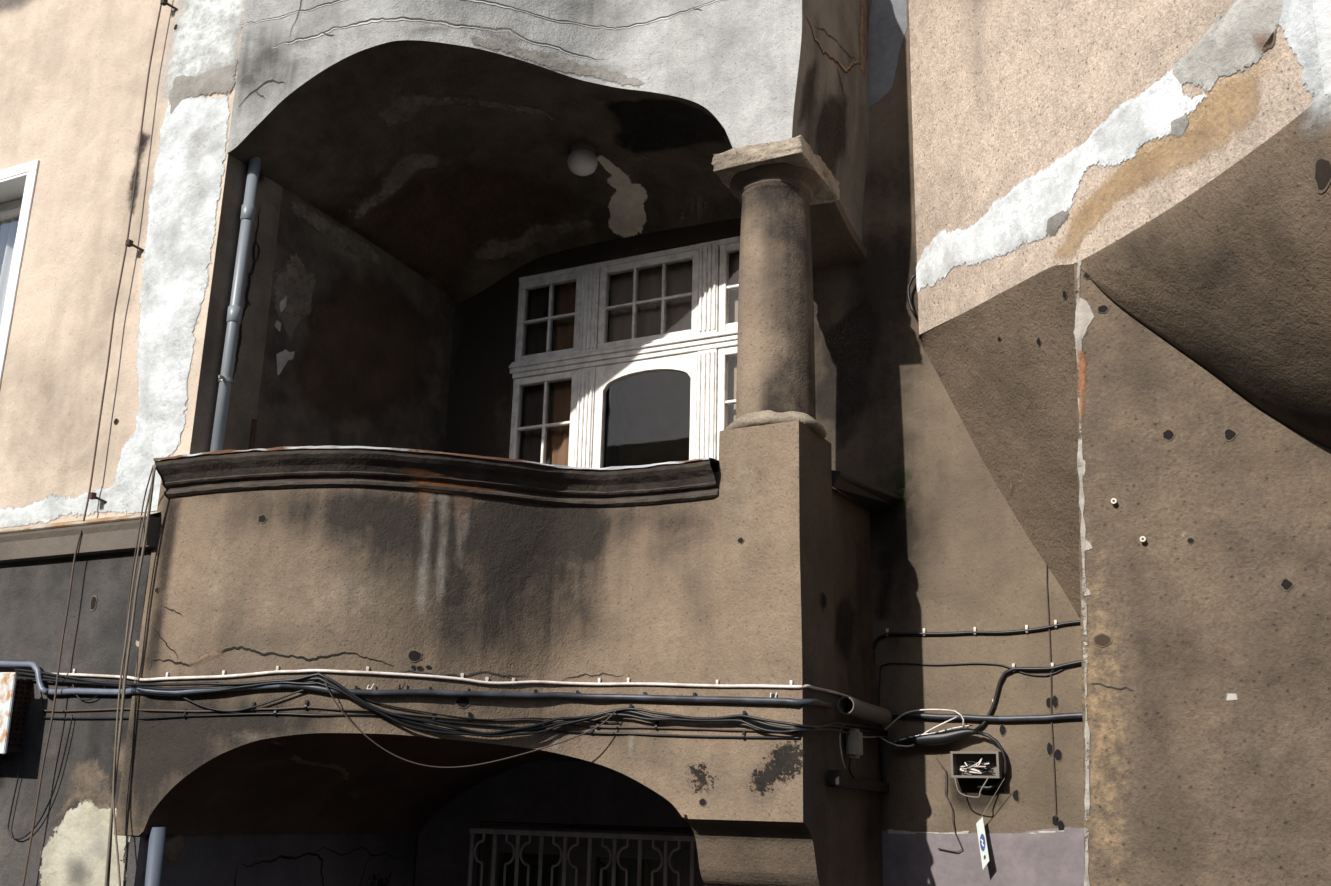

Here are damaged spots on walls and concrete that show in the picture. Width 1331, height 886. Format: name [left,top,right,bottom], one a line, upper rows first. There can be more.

crack [239,0,719,106]
crack [806,16,860,98]
spalling [130,133,149,208]
flaking render [291,153,439,263]
spalling [1046,80,1259,369]
flaking render [273,254,315,375]
crack [150,607,529,681]
spalling [1077,397,1092,886]
spalling [39,744,131,886]
crack [234,847,403,886]
leakage [749,739,809,796]